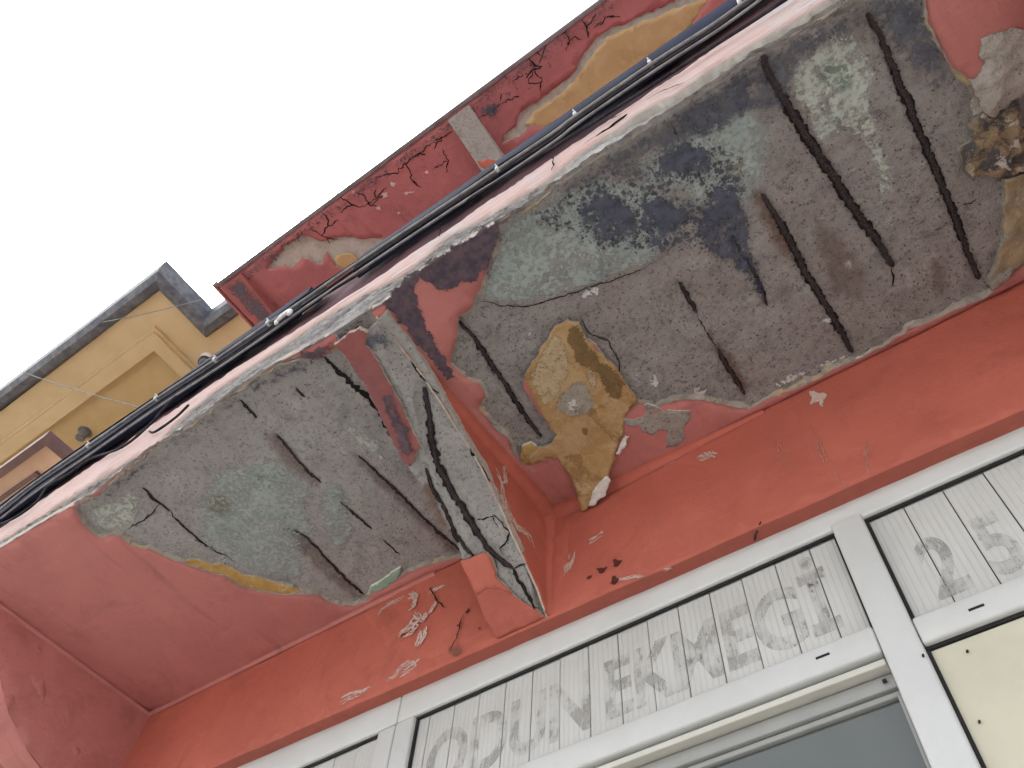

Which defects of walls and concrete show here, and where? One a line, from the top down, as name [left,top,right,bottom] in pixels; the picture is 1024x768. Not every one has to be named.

crack [479,14,620,118]
crack [597,114,627,136]
crack [299,131,452,244]
damp [382,0,946,380]
spalling [0,0,1024,607]
crack [482,260,658,307]
crack [324,356,390,436]
crack [478,515,535,610]
crack [430,588,464,649]